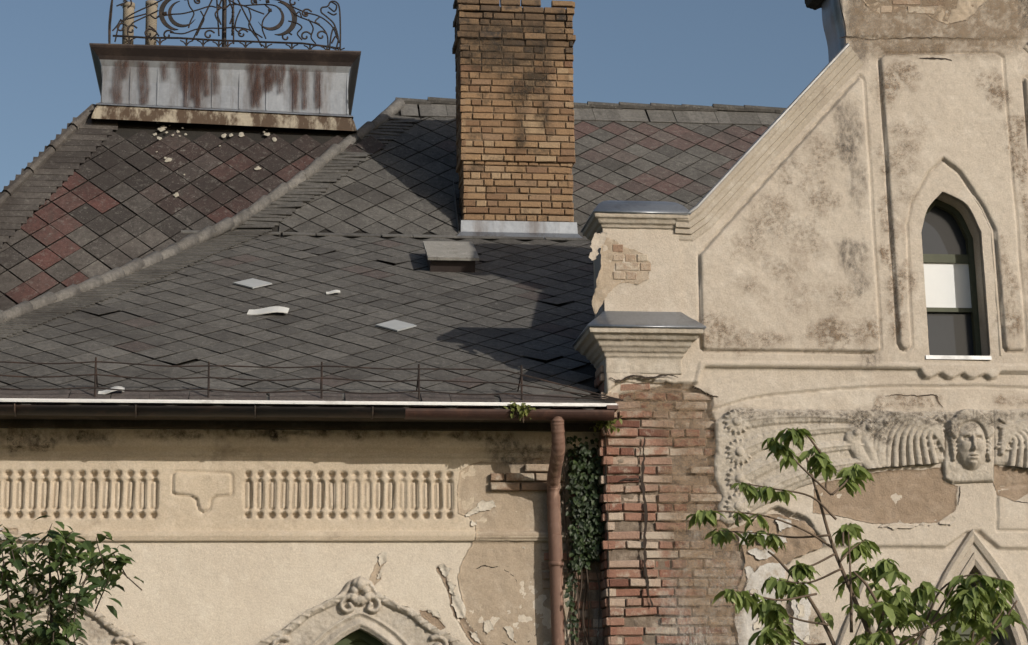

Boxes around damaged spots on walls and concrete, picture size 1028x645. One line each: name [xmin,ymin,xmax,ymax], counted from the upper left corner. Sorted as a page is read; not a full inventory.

flaking render [864,0,987,25]
rust [113,61,149,104]
rust [162,61,218,108]
rust [250,65,321,108]
peeling [588,232,651,314]
damp [810,320,878,344]
flaking render [420,365,823,645]
peeling [0,527,50,556]